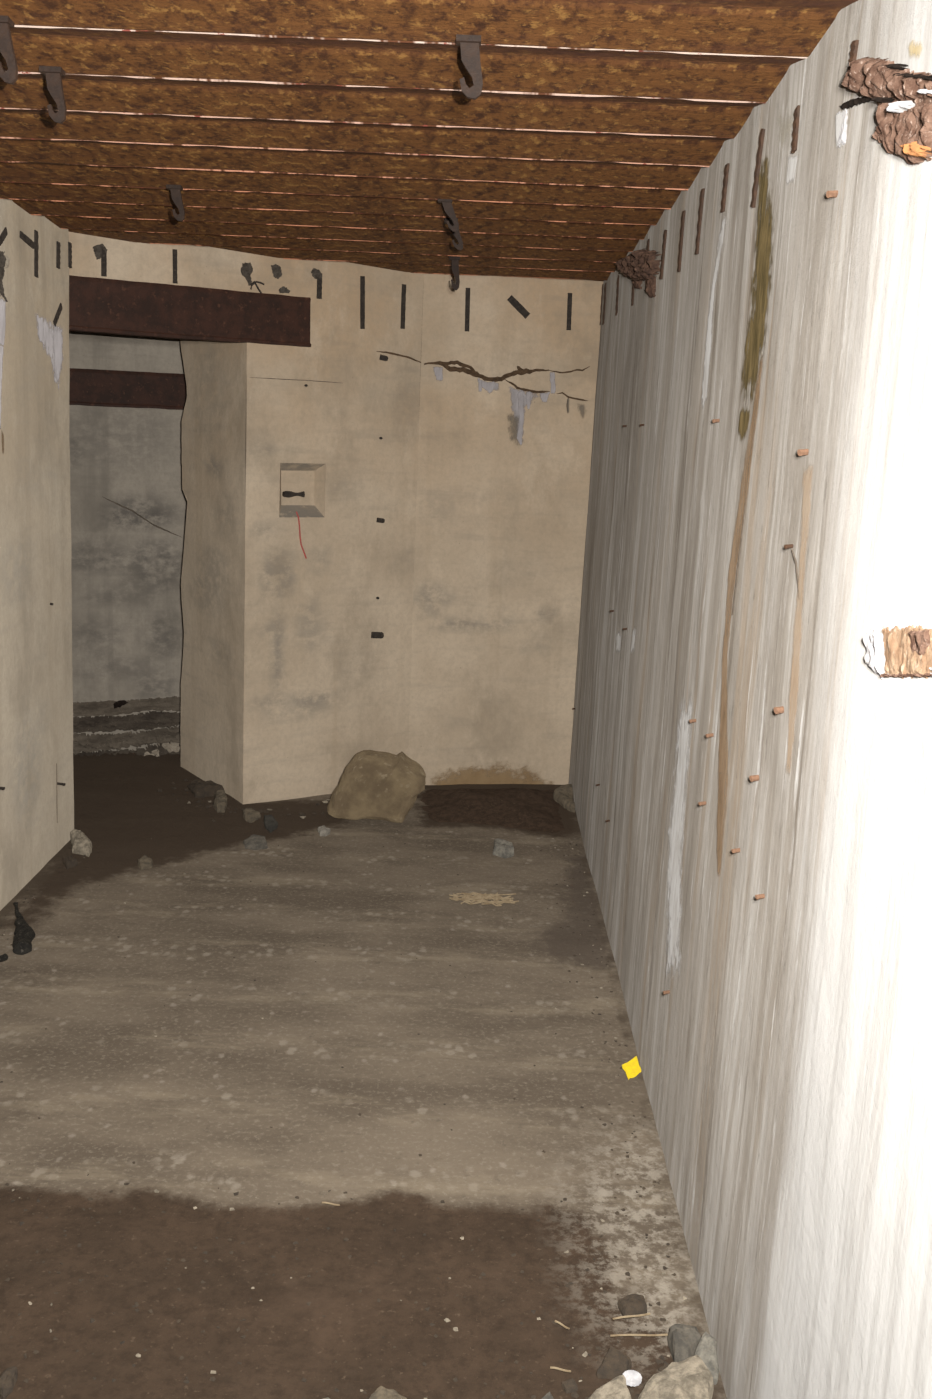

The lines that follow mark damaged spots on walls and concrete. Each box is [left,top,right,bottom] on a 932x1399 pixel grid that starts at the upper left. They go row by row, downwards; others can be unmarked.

spalling [837,57,932,165]
crack [377,351,590,413]
water stain [738,409,750,439]
spalling [863,625,932,679]